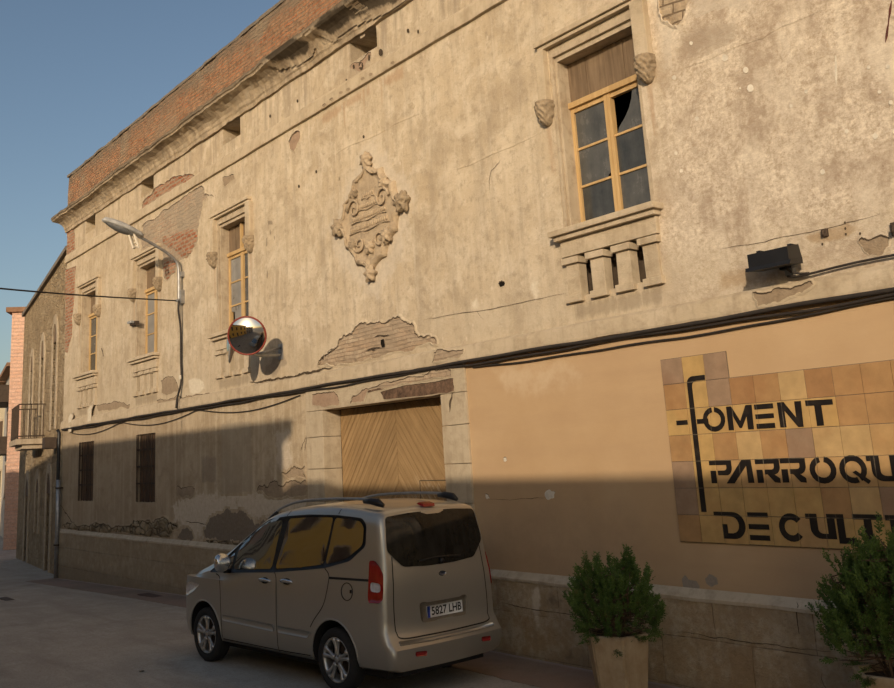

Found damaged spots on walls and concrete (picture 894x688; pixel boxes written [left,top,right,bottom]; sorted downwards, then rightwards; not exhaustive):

flaking render [657,0,692,30]
flaking render [288,129,302,153]
flaking render [142,172,208,226]
flaking render [162,229,197,279]
flaking render [857,232,892,258]
flaking render [752,278,816,308]
flaking render [252,313,465,408]
flaking render [256,463,308,500]